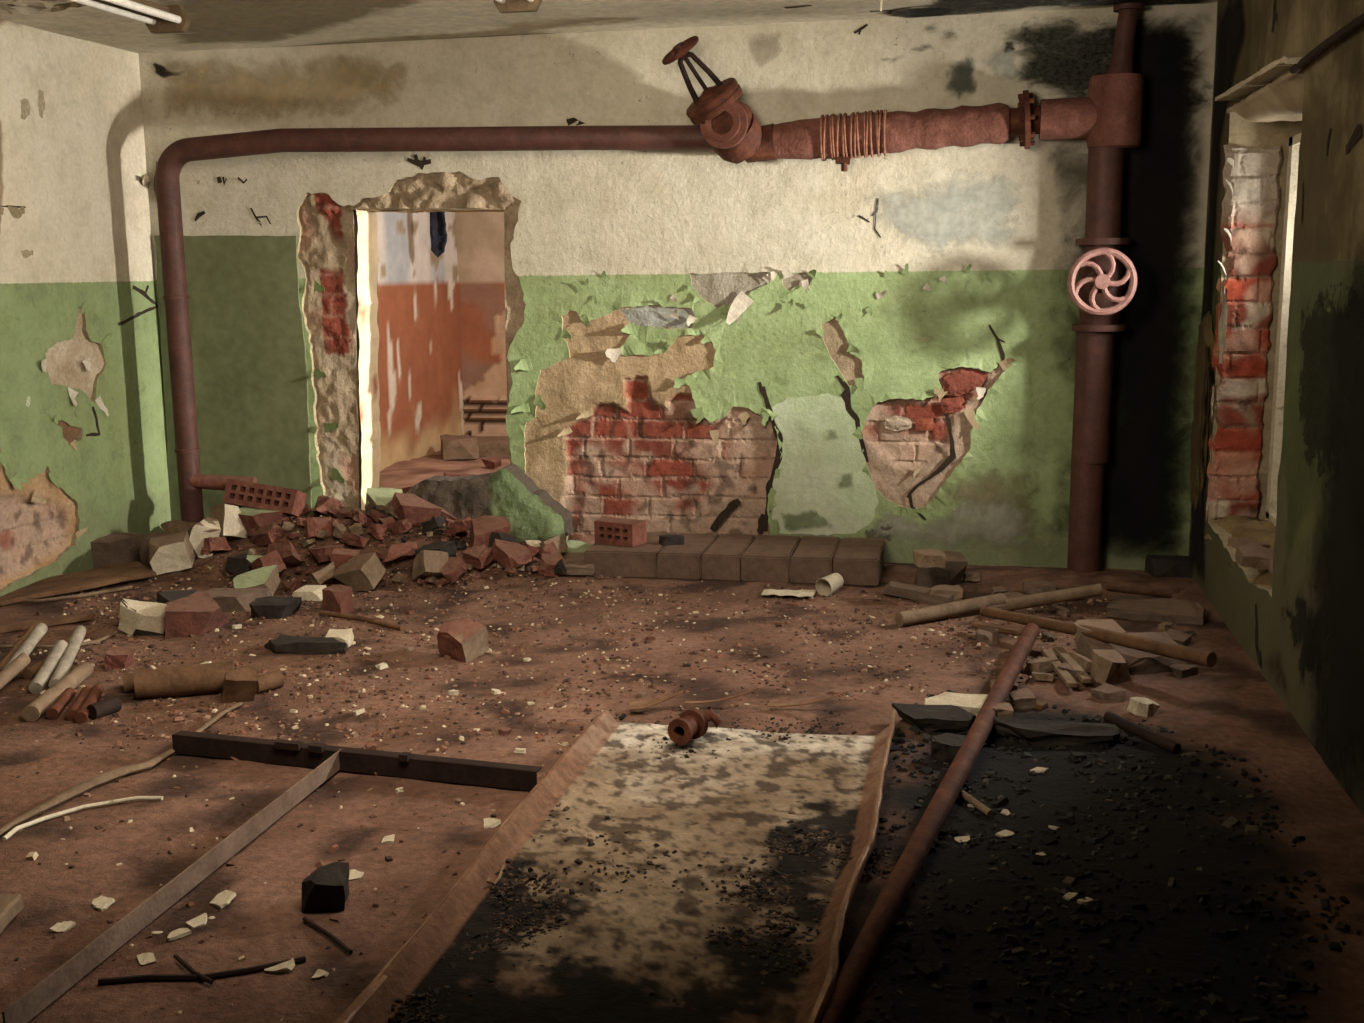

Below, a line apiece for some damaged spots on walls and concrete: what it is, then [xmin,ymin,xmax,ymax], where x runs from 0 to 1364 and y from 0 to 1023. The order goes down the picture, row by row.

peeling [41,301,113,417]
flaking render [298,172,816,545]
peeling [816,314,864,391]
peeling [53,416,80,451]
flaking render [862,358,1016,508]
flaking render [0,452,88,590]